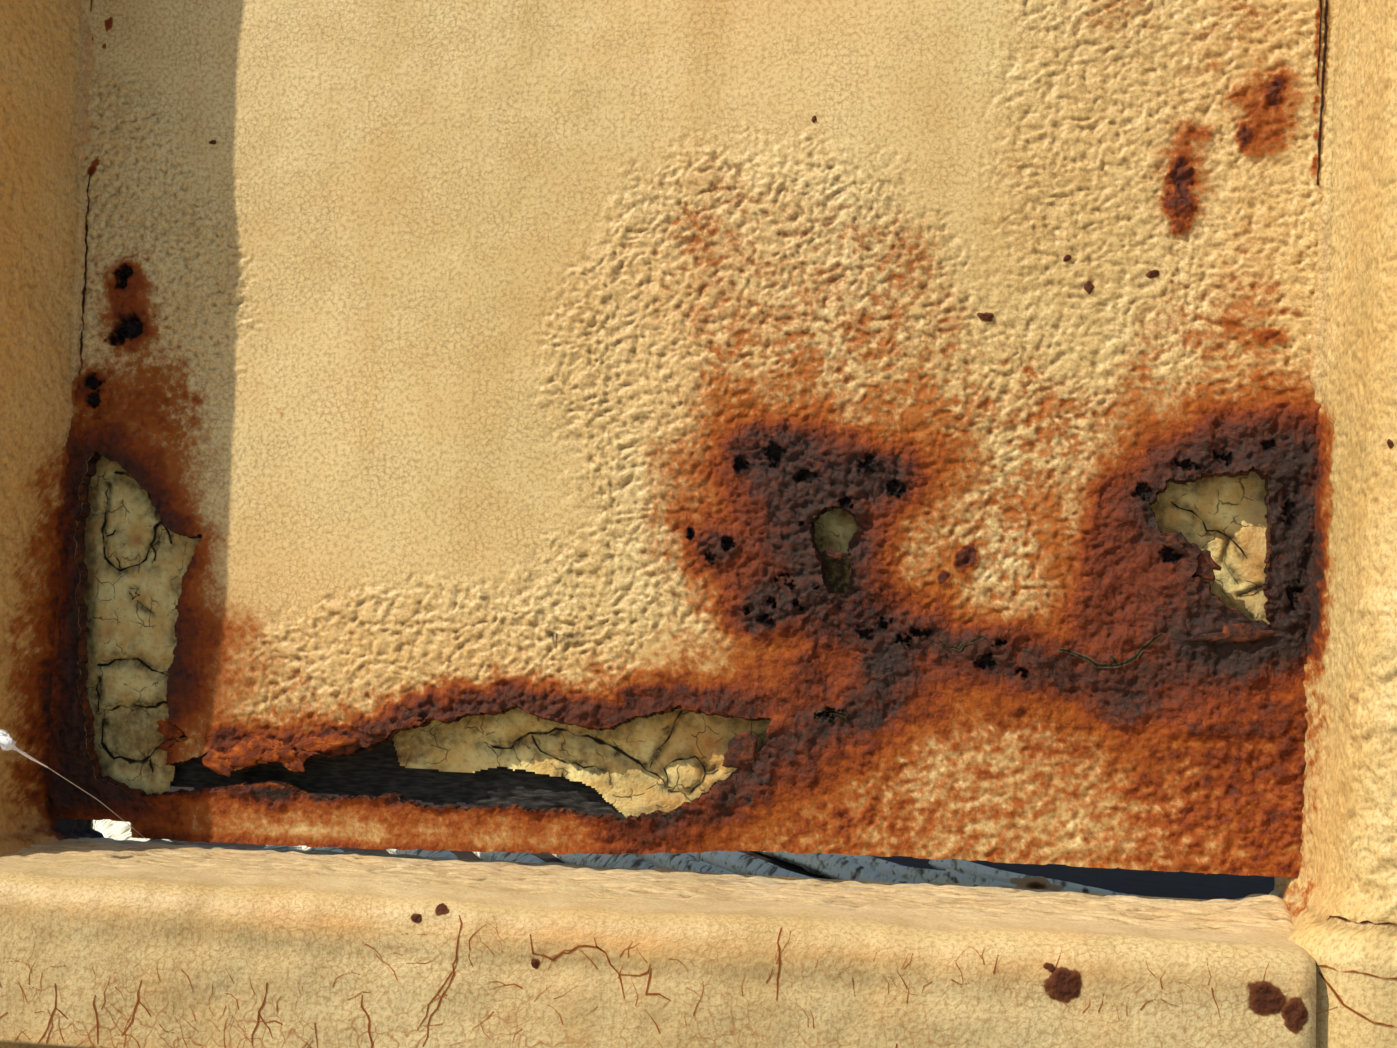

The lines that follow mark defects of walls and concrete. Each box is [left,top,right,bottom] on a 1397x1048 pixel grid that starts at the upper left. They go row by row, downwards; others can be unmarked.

rust [1224,0,1320,176]
rust [1158,120,1212,236]
spalling [1132,482,1154,501]
spalling [1171,450,1233,471]
rust [7,185,1335,916]
peeling [1157,533,1222,581]
spalling [1266,491,1305,611]
peeling [202,709,425,777]
peeling [722,731,759,768]
crack [0,915,704,1048]
crack [741,927,998,1028]
crack [1035,951,1220,1020]